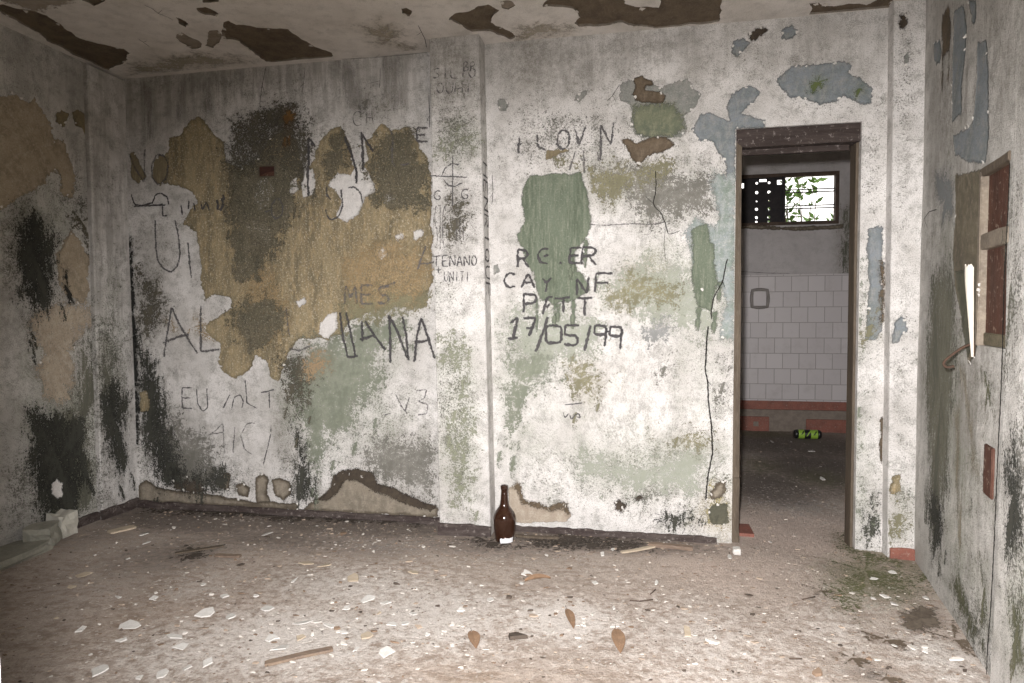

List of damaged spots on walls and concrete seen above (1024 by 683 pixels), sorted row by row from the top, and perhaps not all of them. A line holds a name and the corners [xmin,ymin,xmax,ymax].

spalling [543,0,722,28]
water stain [6,191,89,365]
water stain [17,235,429,528]
peeling [130,116,434,381]
spalling [139,468,439,518]
crack [645,171,679,260]
peeling [619,75,843,342]
crack [705,259,761,500]
water stain [923,251,988,653]
spalling [933,0,989,364]
water stain [980,368,1003,412]
water stain [998,420,1024,581]